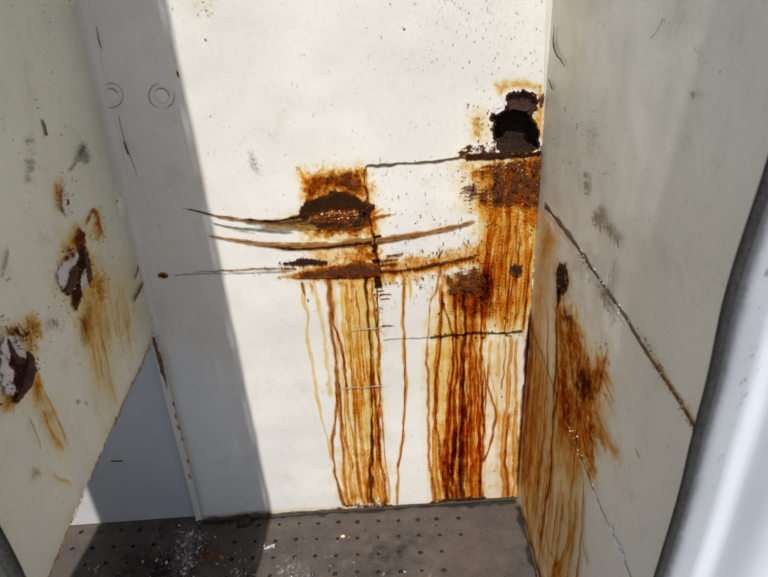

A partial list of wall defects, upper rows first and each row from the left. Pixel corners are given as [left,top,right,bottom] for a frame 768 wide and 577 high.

spalling [492,109,538,153]
rust [0,313,67,410]
rust [48,208,113,344]
rust [265,86,616,577]